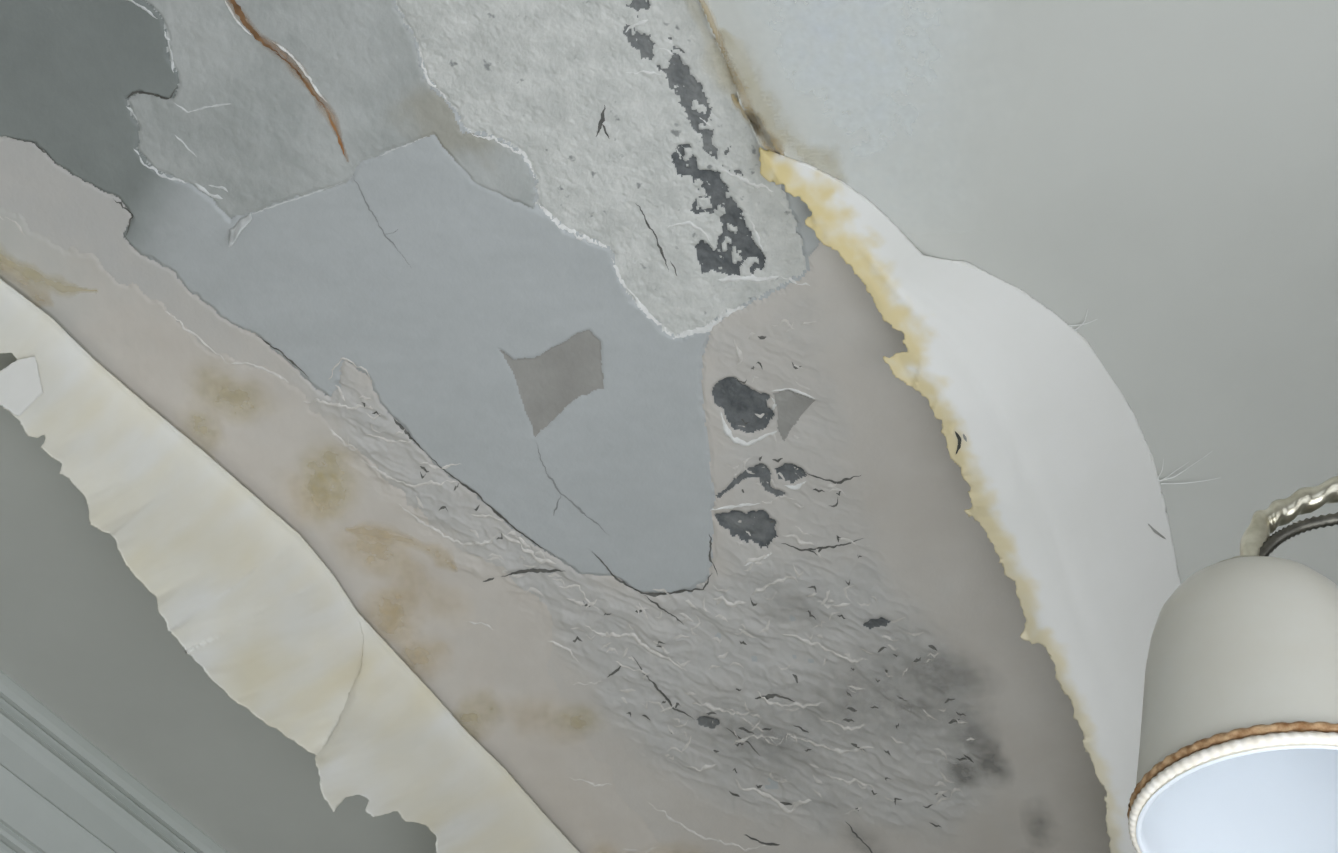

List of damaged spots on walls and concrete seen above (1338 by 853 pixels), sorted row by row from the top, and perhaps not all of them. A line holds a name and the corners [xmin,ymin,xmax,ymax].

corrosion [225,0,347,159]
peeling [0,278,580,853]
peeling [0,0,760,595]
damp [700,2,784,156]
peeling [396,0,1211,853]